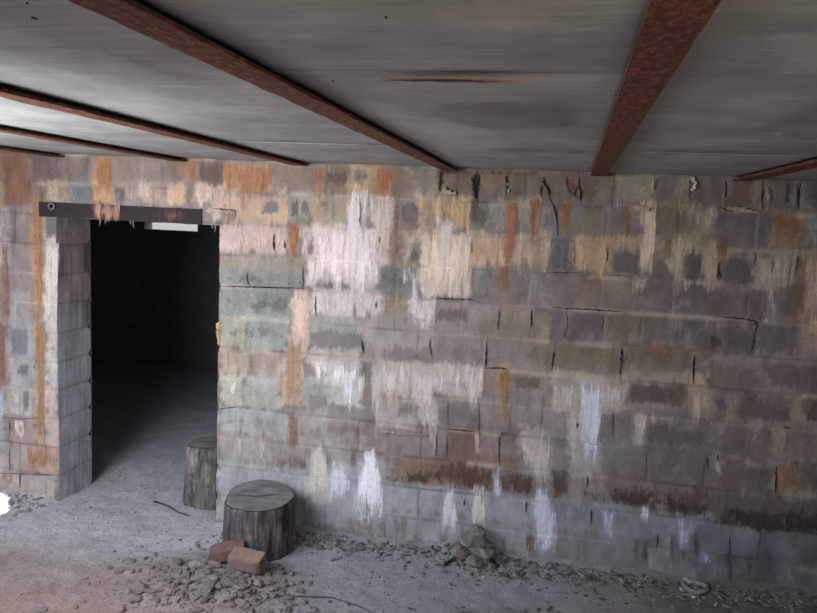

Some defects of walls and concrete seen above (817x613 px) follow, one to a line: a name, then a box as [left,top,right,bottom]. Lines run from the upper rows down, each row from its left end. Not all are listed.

rust [34,201,44,306]
crack [540,178,582,273]
crack [717,316,758,351]
rust [36,327,44,431]
damp [554,382,620,461]
damp [630,385,683,405]
damp [636,416,703,447]
damp [692,391,790,448]
efflorescence [305,445,383,515]
damp [402,439,567,551]
damp [596,487,708,549]
damp [720,509,817,533]